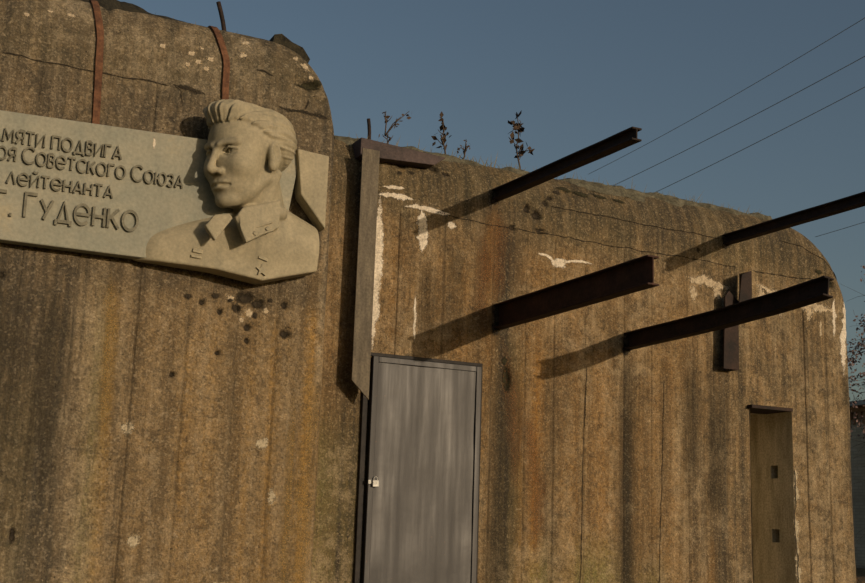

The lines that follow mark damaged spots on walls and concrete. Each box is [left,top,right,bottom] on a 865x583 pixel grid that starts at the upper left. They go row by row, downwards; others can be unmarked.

spalling [185,292,287,344]